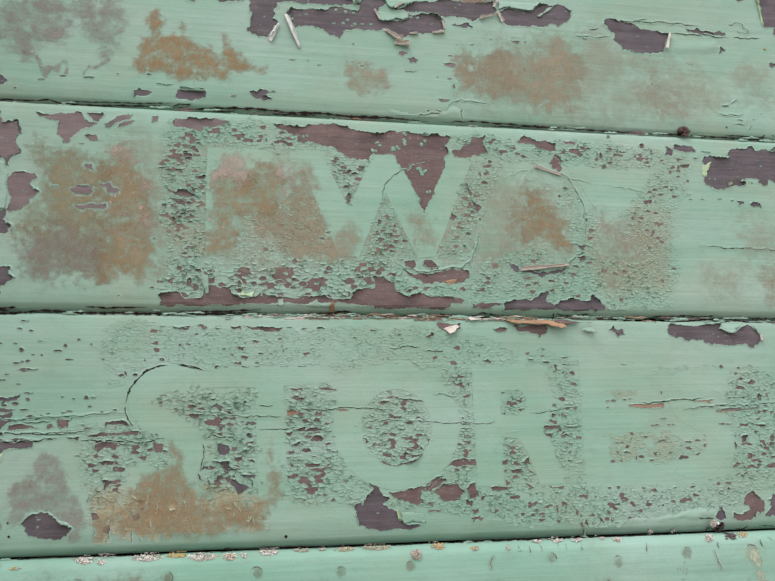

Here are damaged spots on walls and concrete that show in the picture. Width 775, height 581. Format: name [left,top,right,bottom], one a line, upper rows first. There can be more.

corrosion [135,10,261,78]
peeling [217,0,572,72]
peeling [601,18,671,56]
peeling [756,0,775,39]
peeling [36,110,135,146]
corrosion [16,149,154,283]
peeling [148,115,775,313]
peeling [0,265,16,295]
peeling [0,318,46,384]
peeling [77,315,775,532]
peeling [0,380,270,545]
corrosion [94,467,261,537]